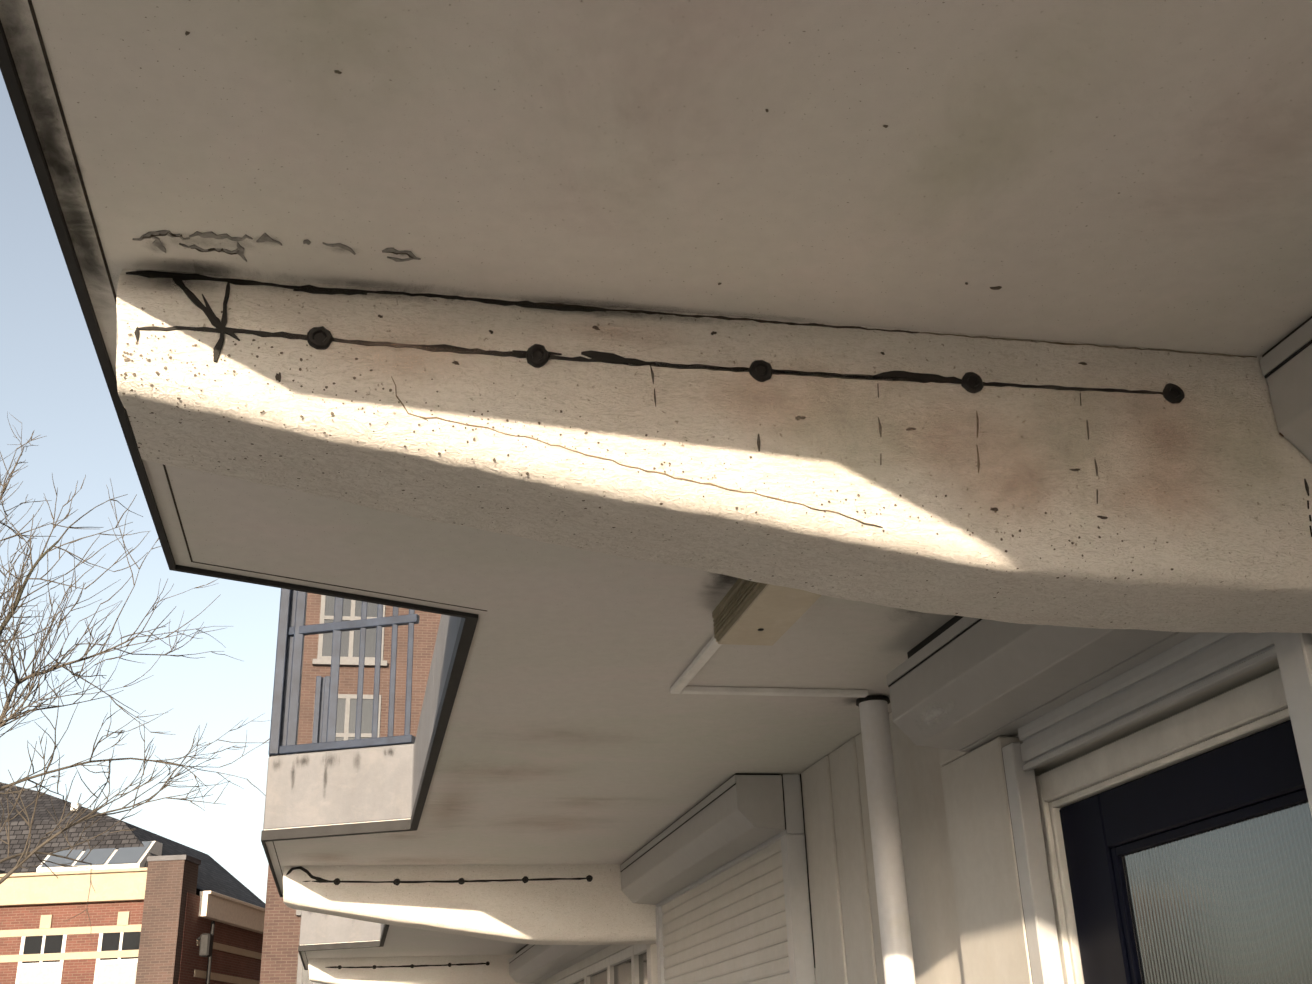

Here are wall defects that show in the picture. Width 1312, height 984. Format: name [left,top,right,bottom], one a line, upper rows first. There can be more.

peeling [132,230,282,262]
peeling [303,239,356,255]
peeling [382,247,421,262]
crack [126,270,1257,528]
crack [286,866,589,883]